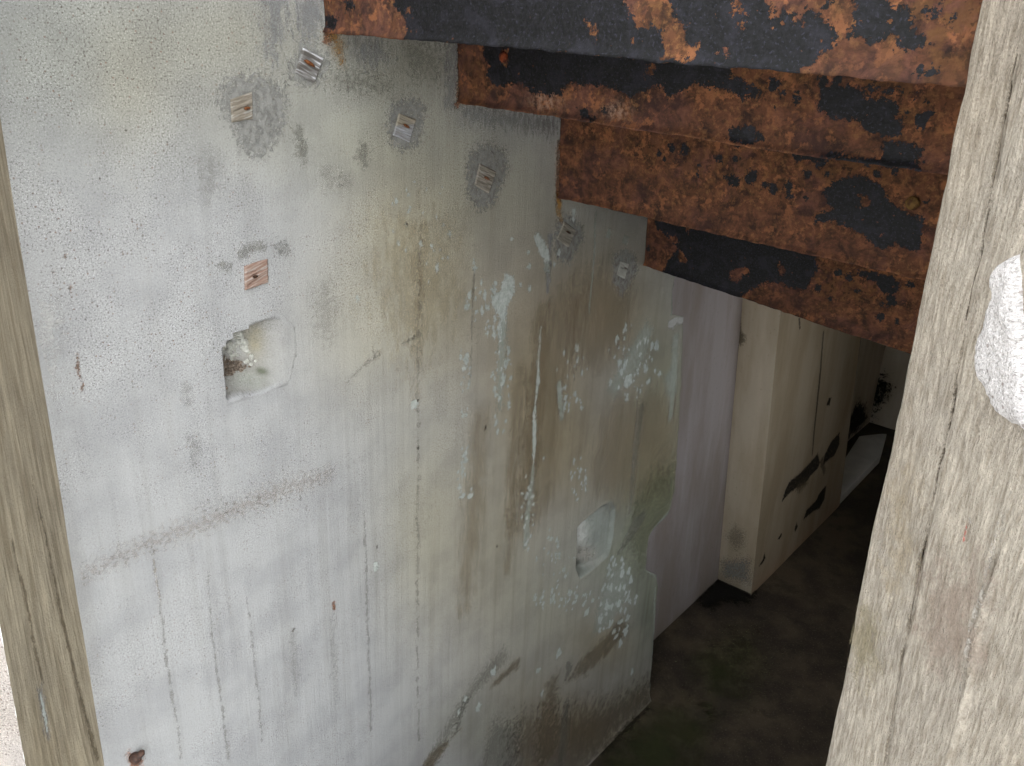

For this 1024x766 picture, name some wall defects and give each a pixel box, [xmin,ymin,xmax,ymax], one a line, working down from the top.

leakage [526,209,585,270]
spalling [222,314,297,406]
leakage [464,259,531,434]
leakage [607,323,661,402]
leakage [848,368,896,439]
leakage [520,327,638,648]
spalling [574,498,618,582]